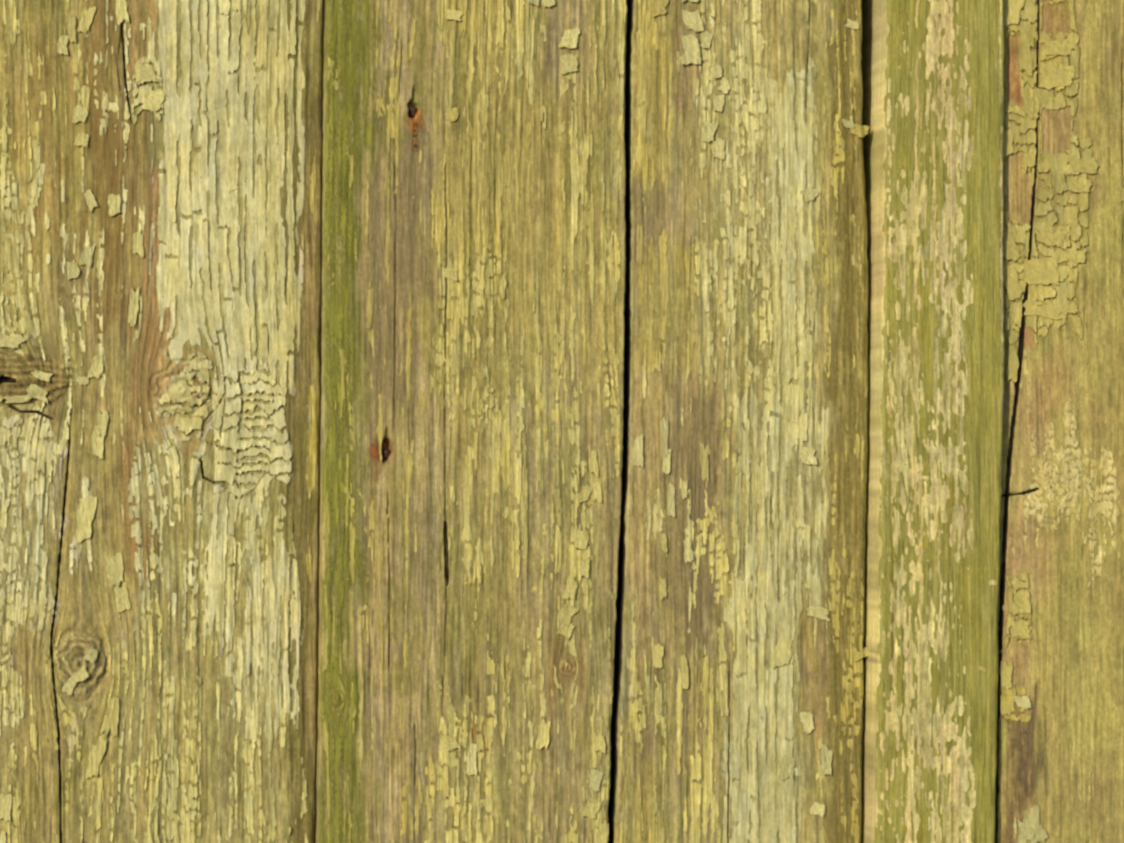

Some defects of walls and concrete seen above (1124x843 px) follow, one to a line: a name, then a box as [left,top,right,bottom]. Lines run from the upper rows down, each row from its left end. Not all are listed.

peeling [0,125,41,355]
peeling [0,370,67,843]
crack [0,376,72,843]
peeling [57,0,308,843]
rust [370,438,392,461]
peeling [424,0,869,843]
peeling [885,0,976,843]
peeling [1000,572,1031,723]
crack [995,119,1038,843]
crack [1033,0,1041,88]
peeling [1003,0,1099,382]
peeling [1022,402,1120,600]